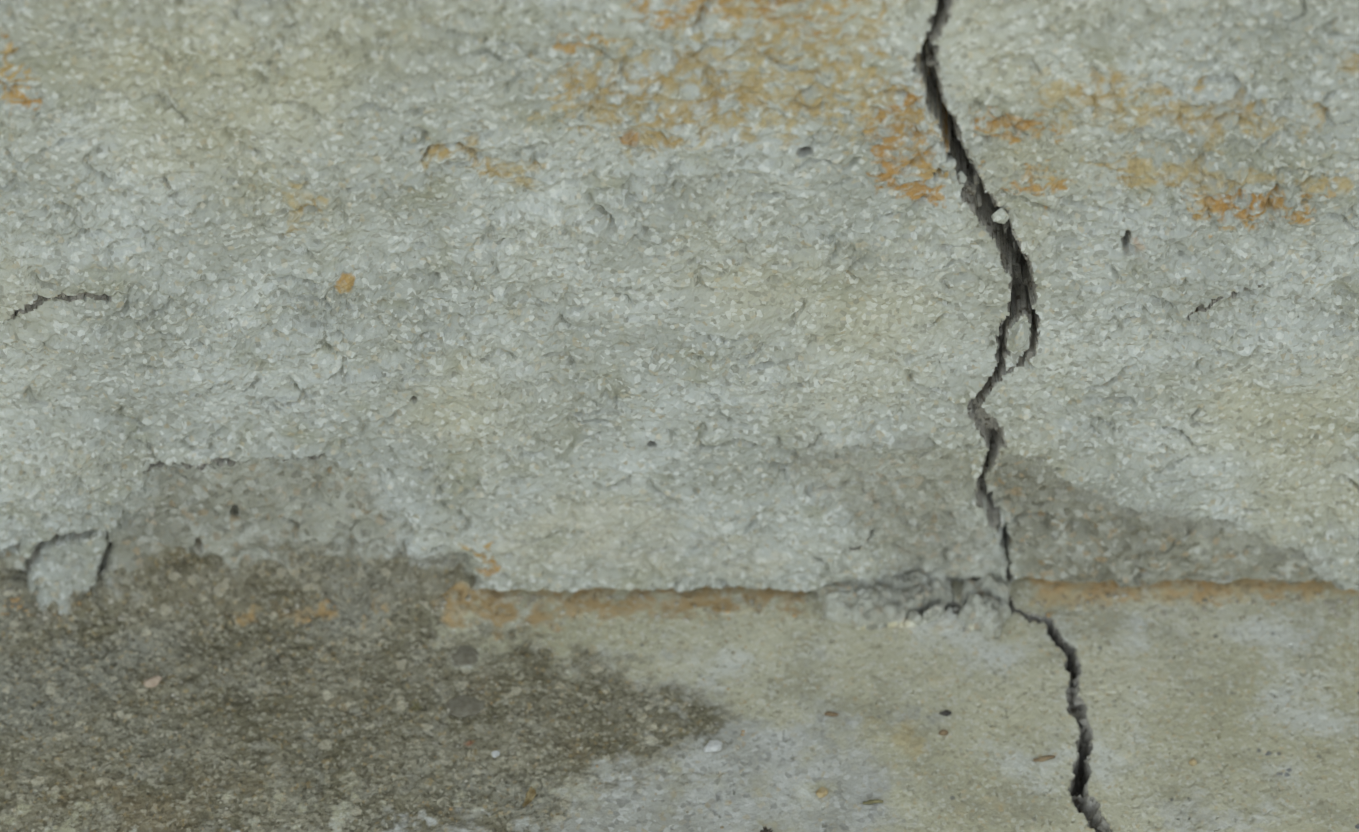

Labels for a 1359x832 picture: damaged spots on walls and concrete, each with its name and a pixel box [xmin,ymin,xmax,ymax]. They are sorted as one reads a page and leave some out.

water stain [419,487,800,589]
crack [912,0,1113,832]
water stain [0,570,982,832]